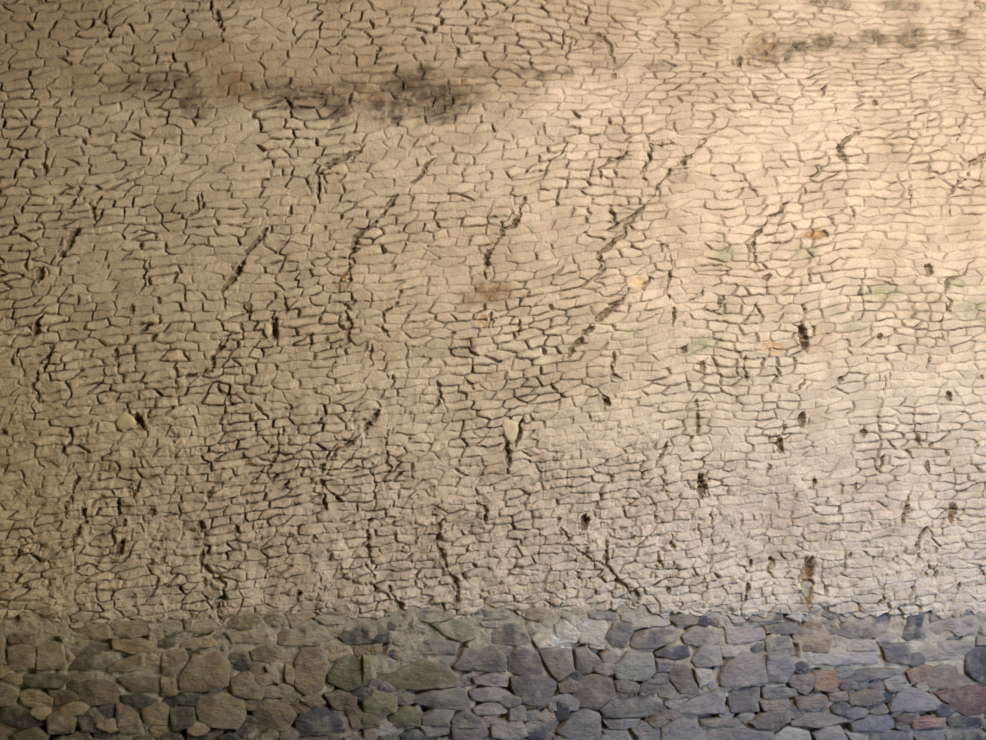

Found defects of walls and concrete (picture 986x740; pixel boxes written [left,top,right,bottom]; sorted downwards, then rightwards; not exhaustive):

crack [220,207,292,309]
crack [316,143,365,197]
crack [308,158,435,388]
crack [483,198,526,278]
crack [568,243,728,358]
crack [597,122,706,270]
crack [752,86,860,266]
crack [185,335,233,404]
crack [62,428,89,551]
crack [319,411,393,508]
crack [433,520,459,609]
crack [561,529,635,603]